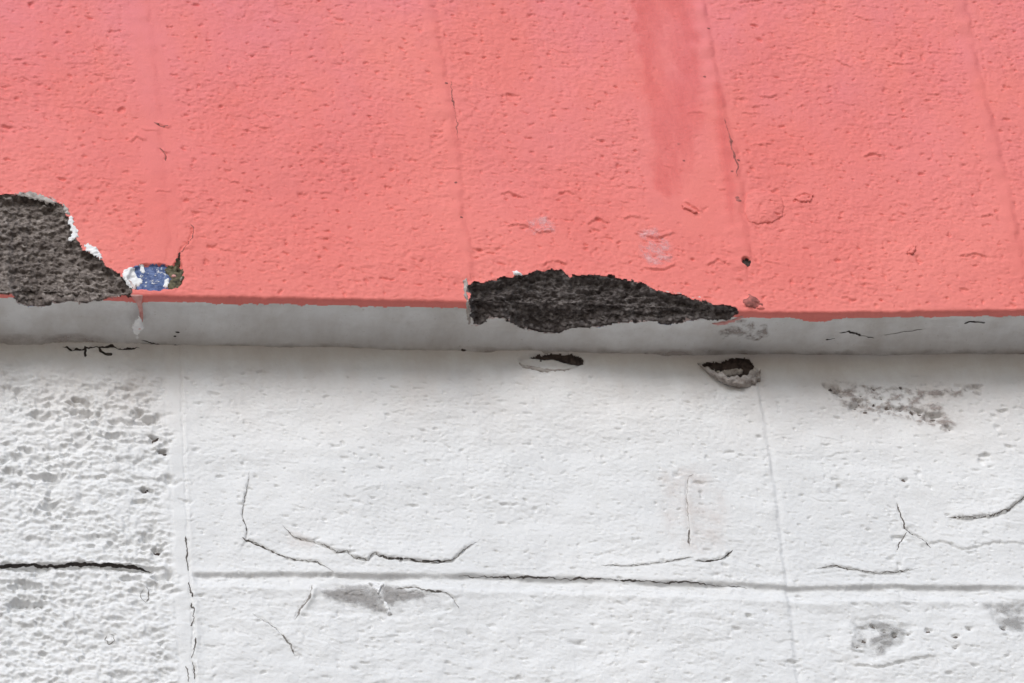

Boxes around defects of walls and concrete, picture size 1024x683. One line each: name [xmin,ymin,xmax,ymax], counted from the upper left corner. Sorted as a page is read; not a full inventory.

spalling [0,191,184,340]
spalling [463,268,743,334]
crack [64,332,180,357]
crack [826,329,922,340]
peeling [697,358,761,388]
crack [951,497,1024,518]
crack [242,473,747,589]
crack [0,562,150,602]
crack [185,536,196,681]